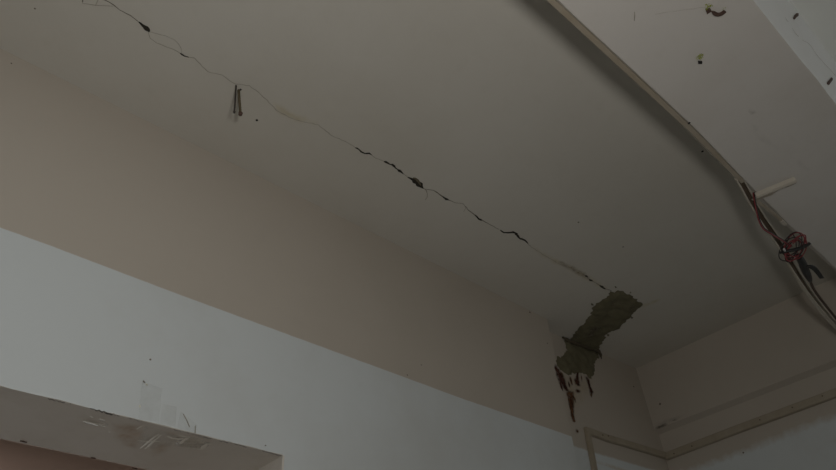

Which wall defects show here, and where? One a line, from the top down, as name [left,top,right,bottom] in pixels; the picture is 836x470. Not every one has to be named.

crack [82,0,612,291]
rust [554,366,595,433]